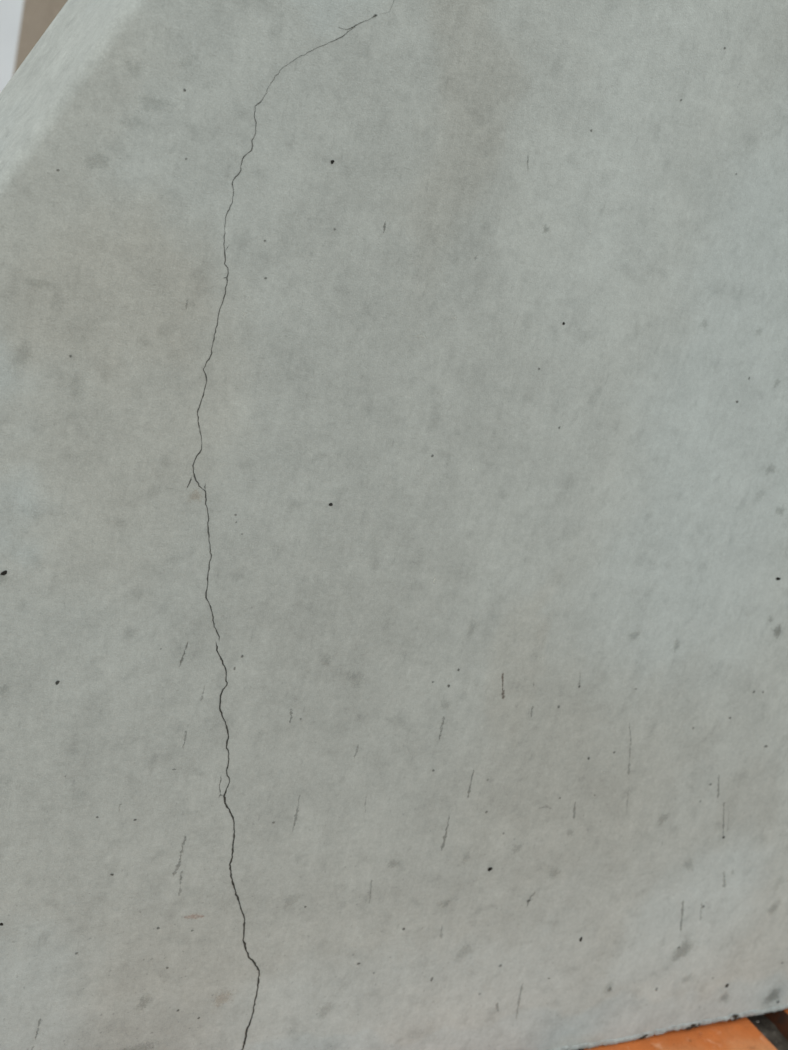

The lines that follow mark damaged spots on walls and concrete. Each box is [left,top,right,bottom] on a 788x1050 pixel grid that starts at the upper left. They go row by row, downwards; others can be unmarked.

crack [187,4,393,1050]